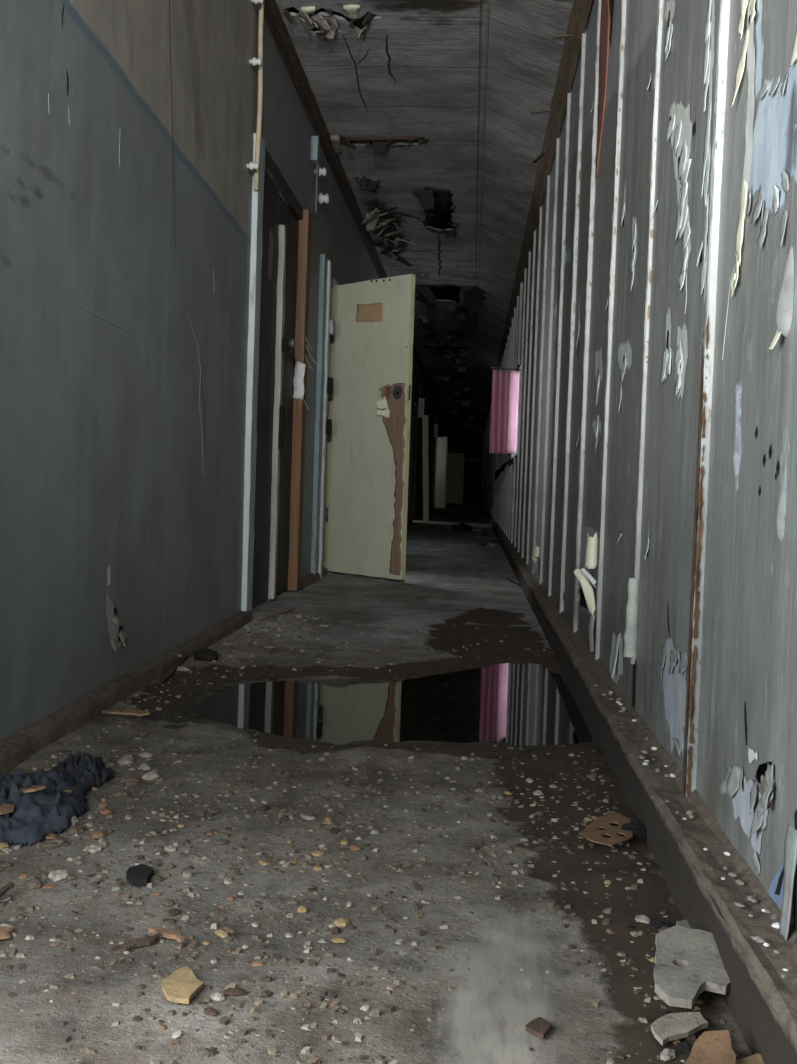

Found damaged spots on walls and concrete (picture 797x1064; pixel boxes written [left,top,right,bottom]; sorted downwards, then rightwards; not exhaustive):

crack [343,33,396,112]
water stain [375,0,477,11]
peeling [664,0,675,63]
peeling [666,0,715,310]
peeling [730,0,797,299]
peeling [660,307,688,399]
flaking render [106,566,127,652]
peeling [562,524,600,653]
rust [682,316,709,796]
peeling [718,748,775,875]
peeling [768,809,797,940]